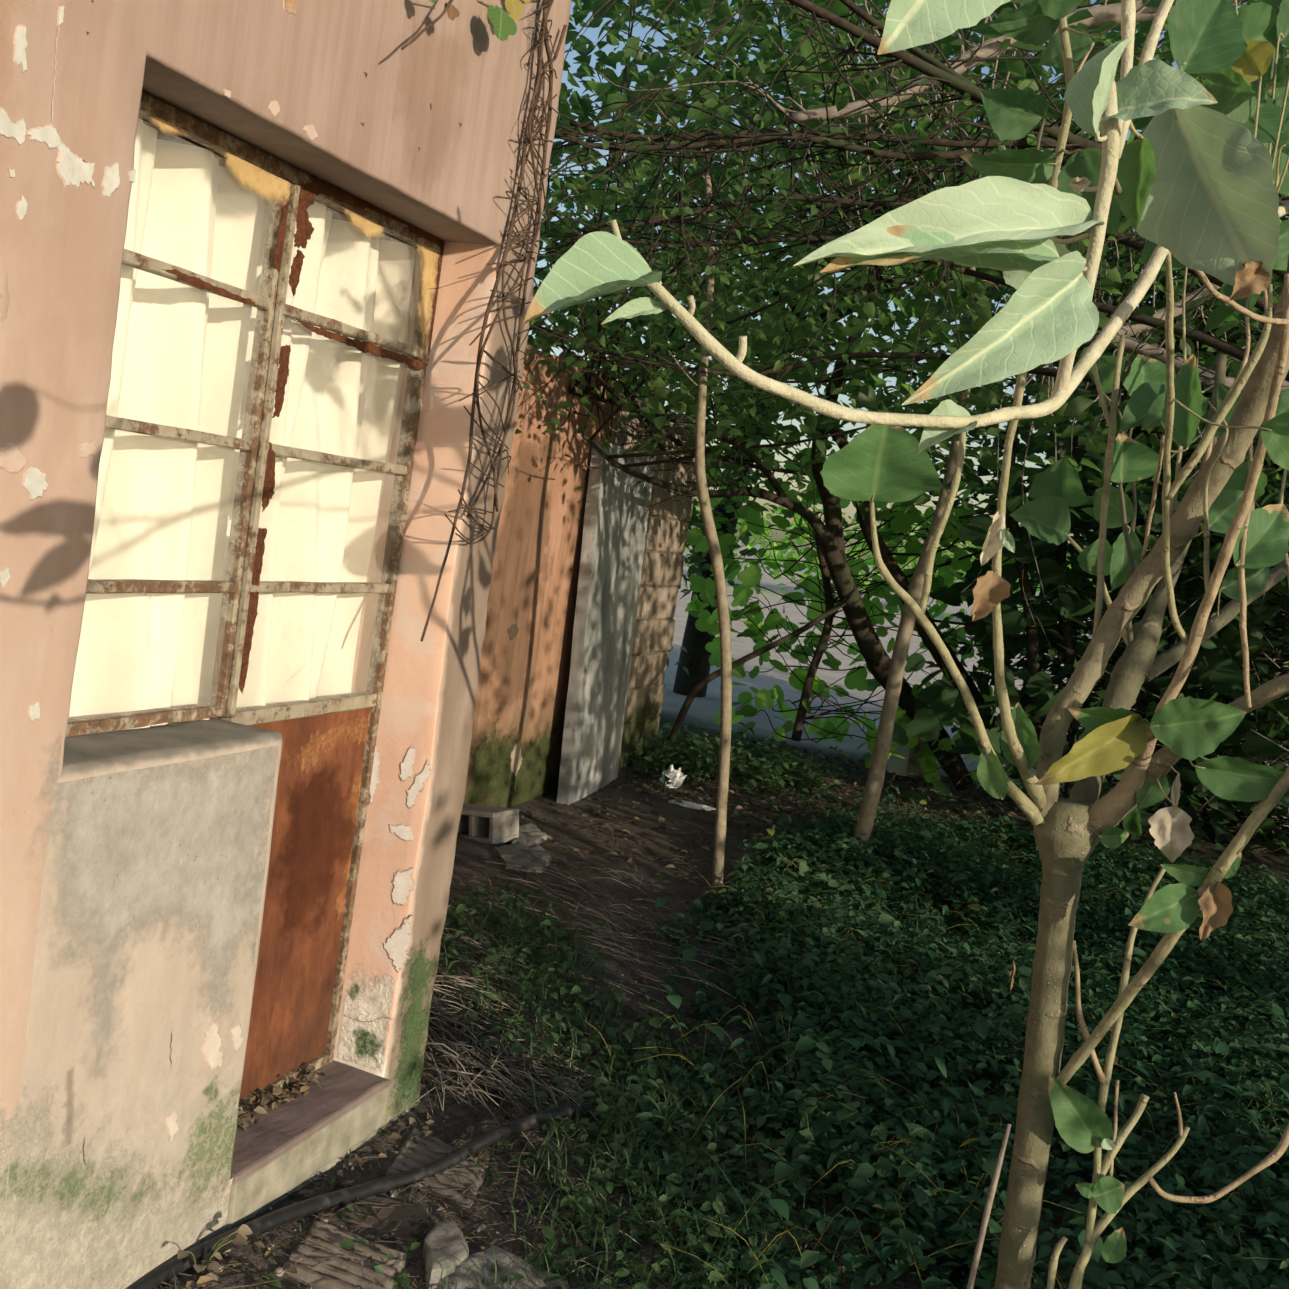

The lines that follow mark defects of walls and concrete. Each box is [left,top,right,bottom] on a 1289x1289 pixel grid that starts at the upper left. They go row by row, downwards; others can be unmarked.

peeling [0,106,136,198]
rust [162,269,256,307]
rust [274,175,444,369]
rust [272,345,291,418]
peeling [0,443,49,501]
rust [239,442,276,693]
rust [280,716,370,930]
peeling [369,745,381,806]
peeling [389,746,432,841]
flaking render [52,746,278,1071]
water stain [354,1030,382,1060]
water stain [179,1083,240,1196]